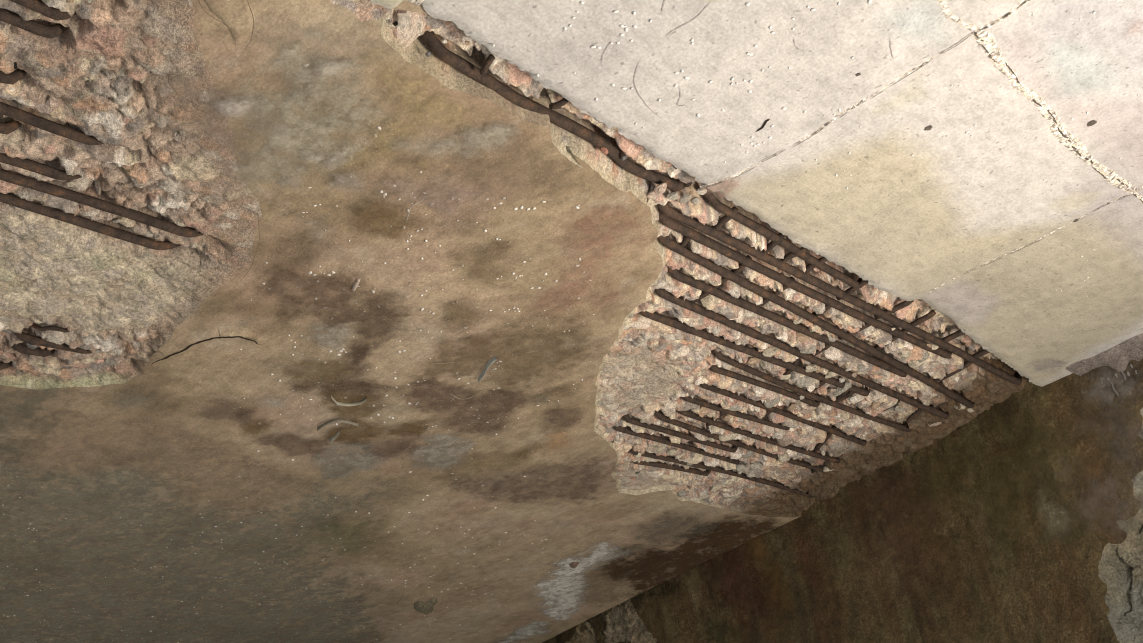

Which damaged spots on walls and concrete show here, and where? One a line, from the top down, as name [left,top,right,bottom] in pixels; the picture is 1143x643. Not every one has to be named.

spalling [0,0,262,390]
spalling [329,0,1028,518]
crack [149,326,269,367]
leakage [0,222,616,643]
peeling [317,395,367,444]
leakage [499,513,714,643]
peeling [565,599,657,643]
spalling [1098,470,1143,643]